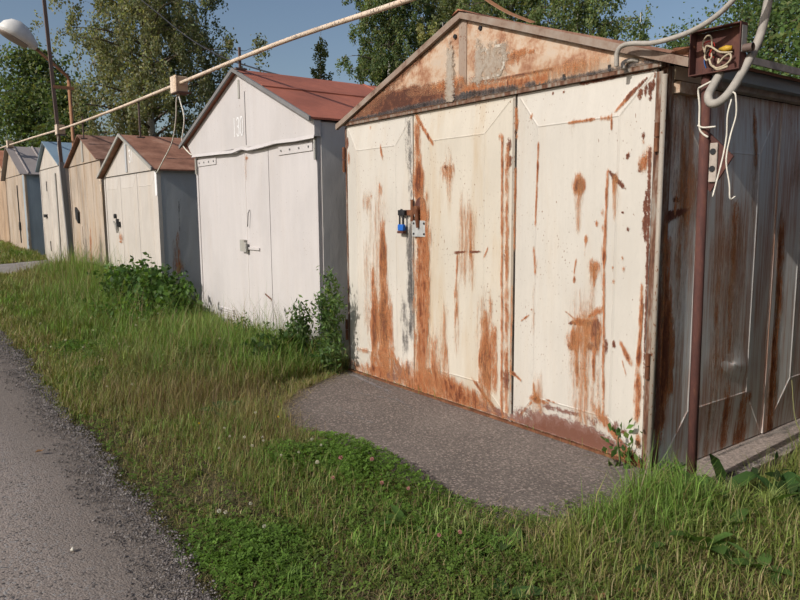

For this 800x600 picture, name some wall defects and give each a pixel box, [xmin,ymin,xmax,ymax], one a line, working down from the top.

corrosion [350,48,598,422]
corrosion [566,132,652,464]
corrosion [655,96,698,447]